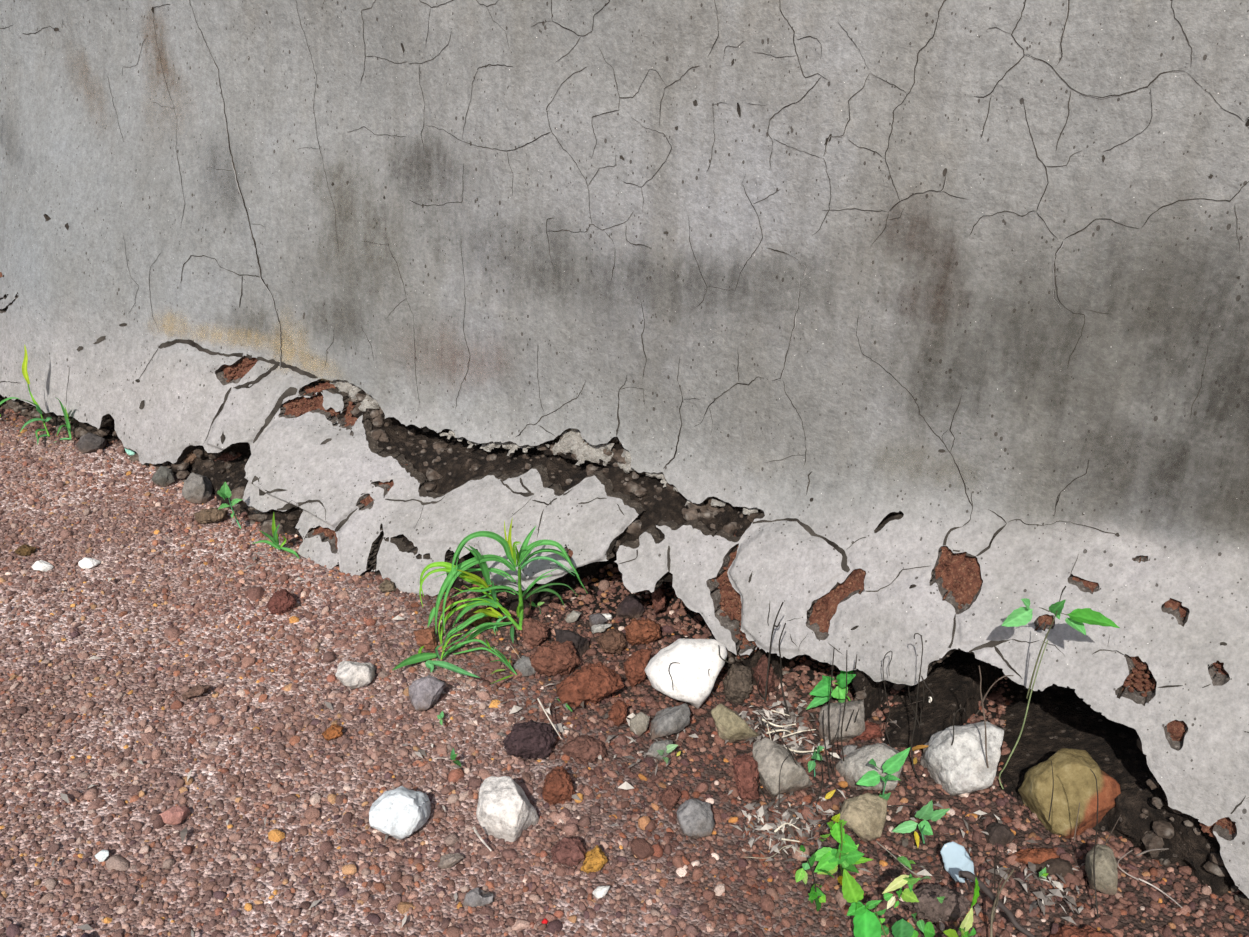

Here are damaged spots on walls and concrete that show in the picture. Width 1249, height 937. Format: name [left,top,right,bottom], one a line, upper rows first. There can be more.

crack [108,0,1249,600]
spalling [215,356,259,385]
spalling [278,379,380,436]
spalling [440,428,726,507]
spalling [706,535,762,659]
crack [767,603,842,654]
spalling [806,568,866,640]
spalling [929,546,983,614]
crack [948,614,1061,678]
spalling [1115,654,1157,706]
crack [1158,682,1211,690]
spalling [1162,720,1188,751]